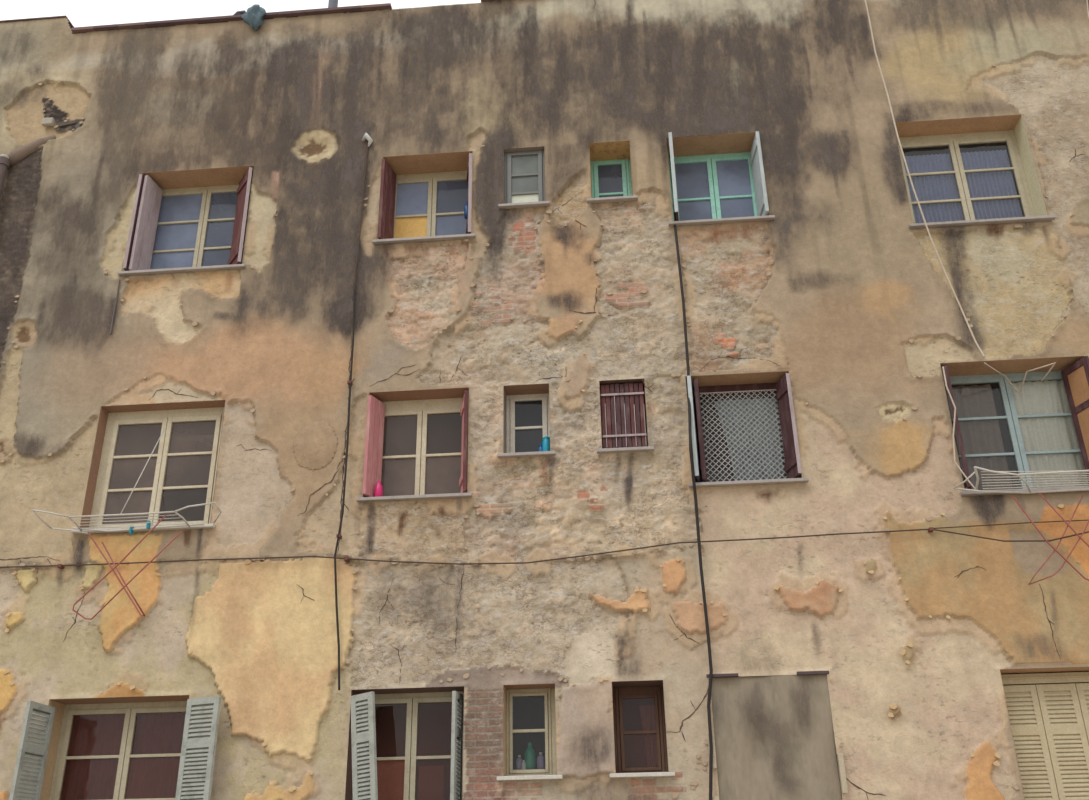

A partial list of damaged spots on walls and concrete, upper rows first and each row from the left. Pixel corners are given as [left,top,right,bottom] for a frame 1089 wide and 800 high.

flaking render [6,81,91,146]
damp [39,276,117,345]
damp [205,34,386,335]
flaking render [292,130,338,163]
flaking render [468,131,485,181]
damp [393,0,847,260]
flaking render [902,55,1089,378]
crack [297,336,466,553]
flaking render [0,166,1089,800]